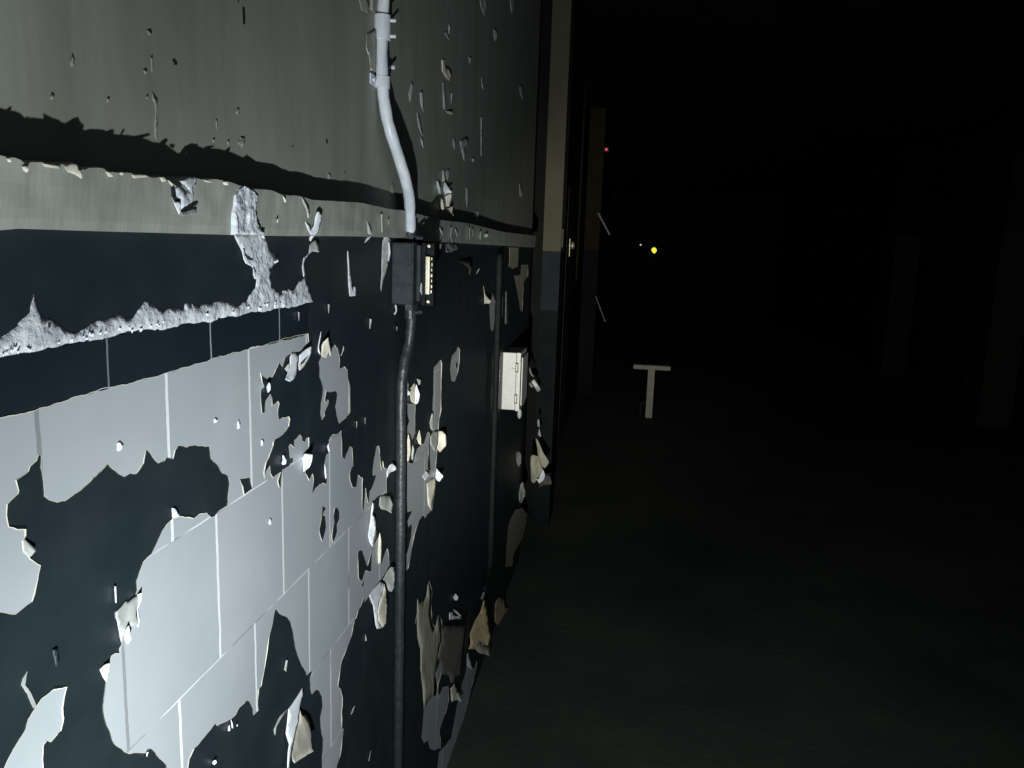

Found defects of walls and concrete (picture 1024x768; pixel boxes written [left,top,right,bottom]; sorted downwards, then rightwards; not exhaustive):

spalling [42,163,83,179]
peeling [409,83,423,147]
peeling [441,59,453,115]
peeling [436,170,488,275]
peeling [453,117,483,162]
peeling [0,171,460,768]
peeling [505,419,552,567]
peeling [415,582,509,768]